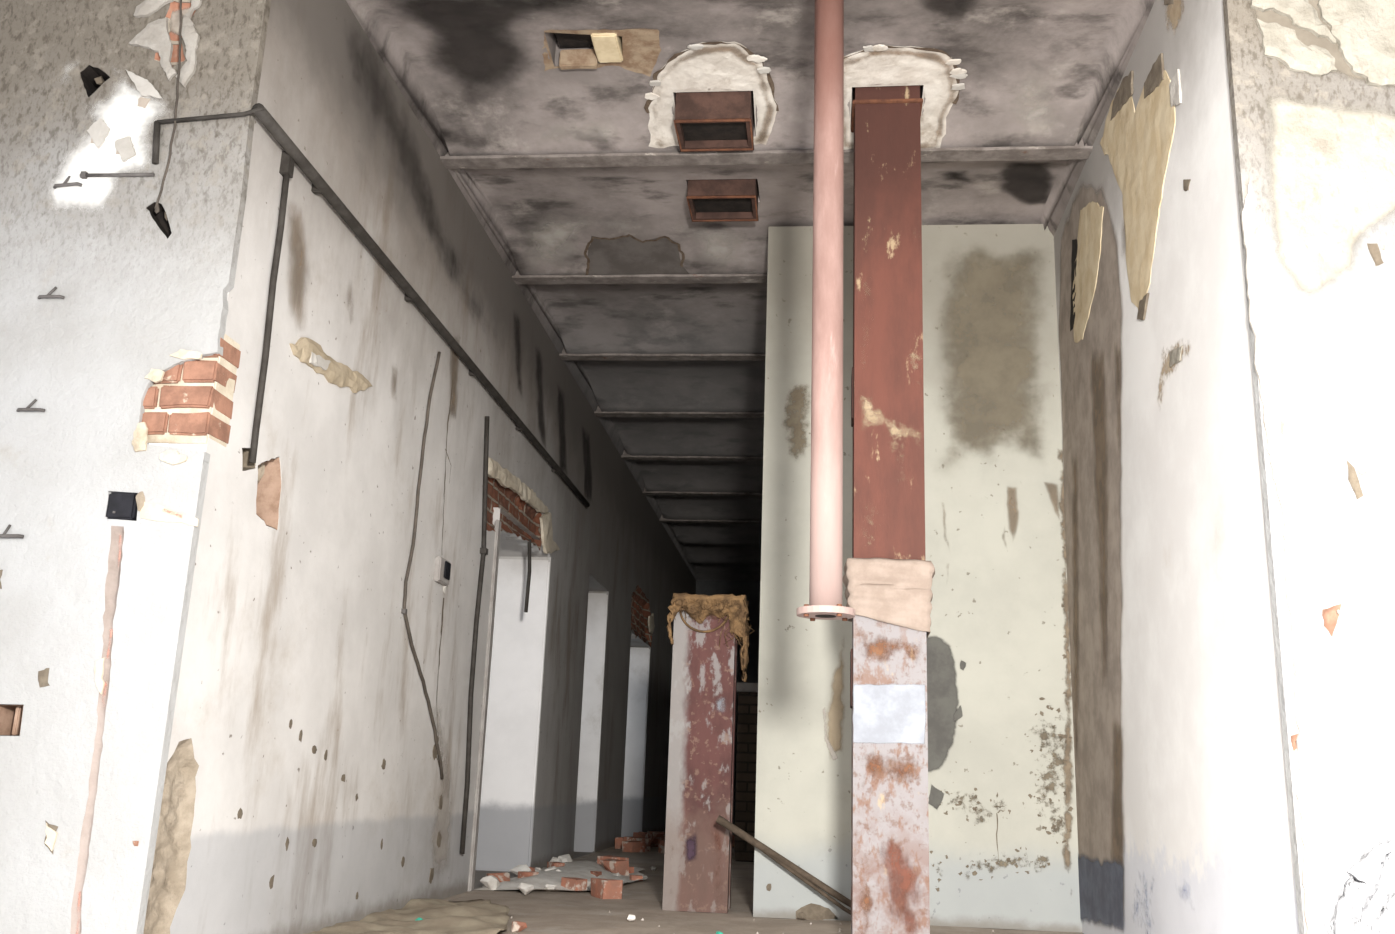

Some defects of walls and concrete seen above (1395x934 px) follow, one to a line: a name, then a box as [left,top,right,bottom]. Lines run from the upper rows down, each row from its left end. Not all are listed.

peeling [52,0,202,207]
damp [927,0,972,16]
peeling [1100,53,1182,320]
flaking render [1250,0,1395,87]
flaking render [132,334,281,530]
damp [946,253,1036,448]
damp [1008,488,1018,533]
flaking render [1241,98,1395,934]
corrosion [866,640,915,660]
corrosion [867,756,914,781]
damp [926,637,966,809]
corrosion [885,843,916,930]